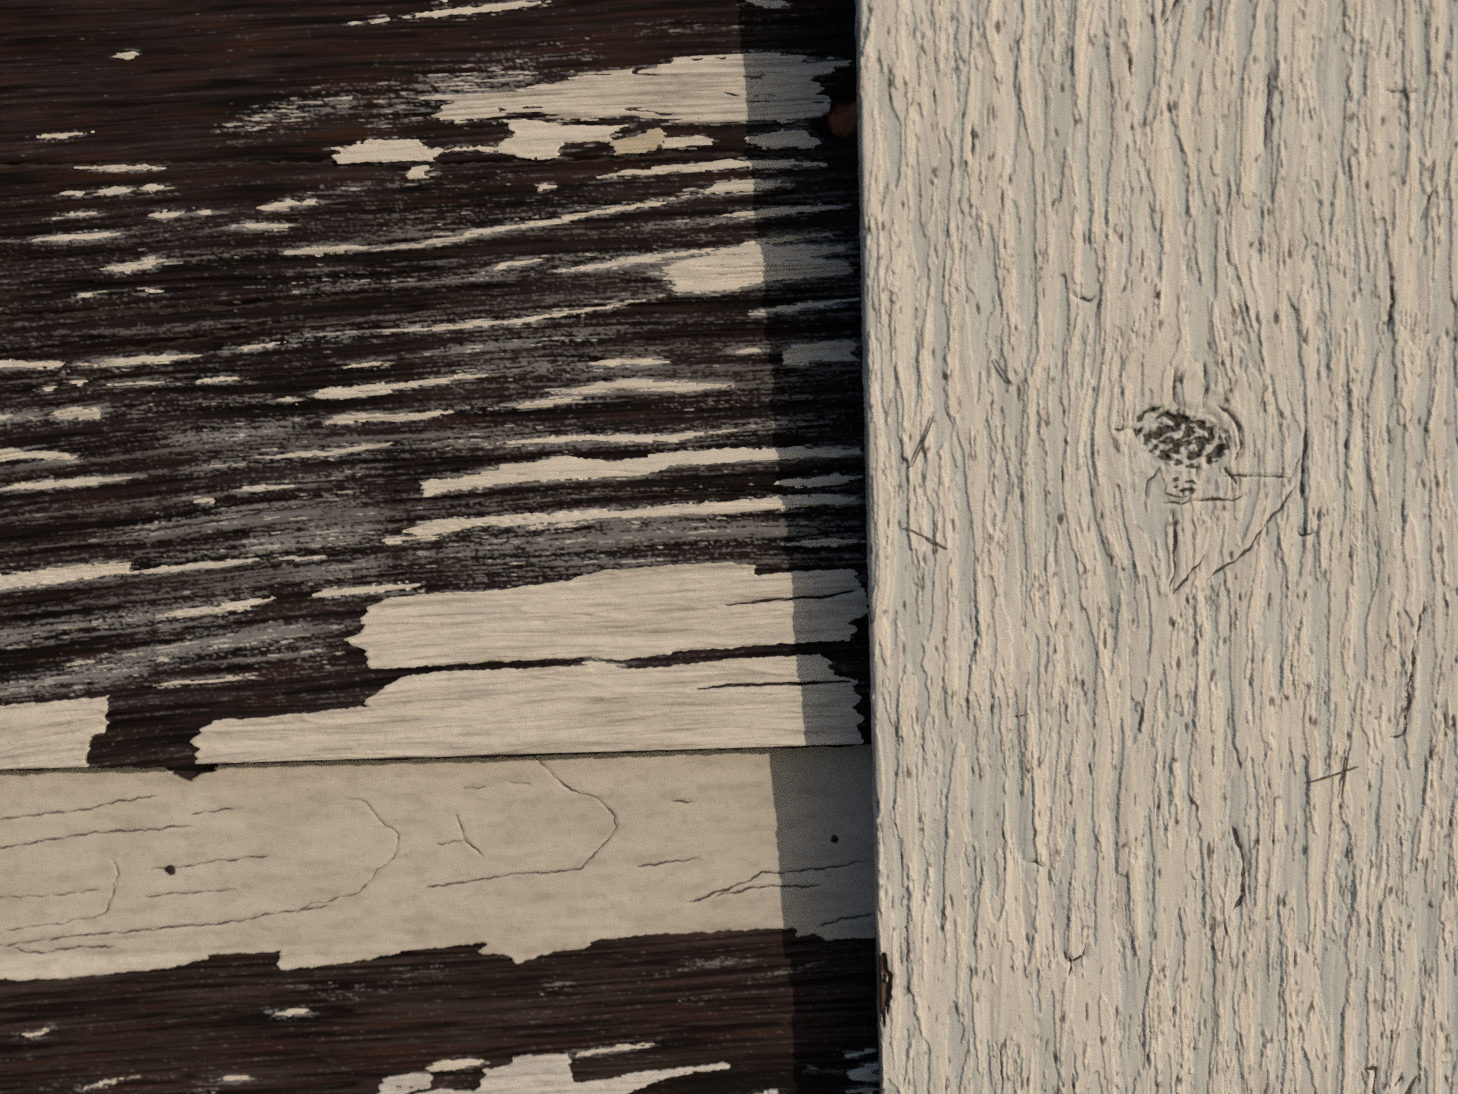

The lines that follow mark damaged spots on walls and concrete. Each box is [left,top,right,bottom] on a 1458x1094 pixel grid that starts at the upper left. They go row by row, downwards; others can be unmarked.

peeling [283,52,852,257]
peeling [32,164,166,242]
peeling [382,233,860,332]
peeling [0,354,202,391]
peeling [277,361,493,425]
peeling [382,429,863,545]
crack [426,756,617,888]
crack [0,795,399,954]
crack [637,857,698,867]
crack [688,860,872,902]
crack [818,914,874,927]
peeling [377,1043,730,1094]